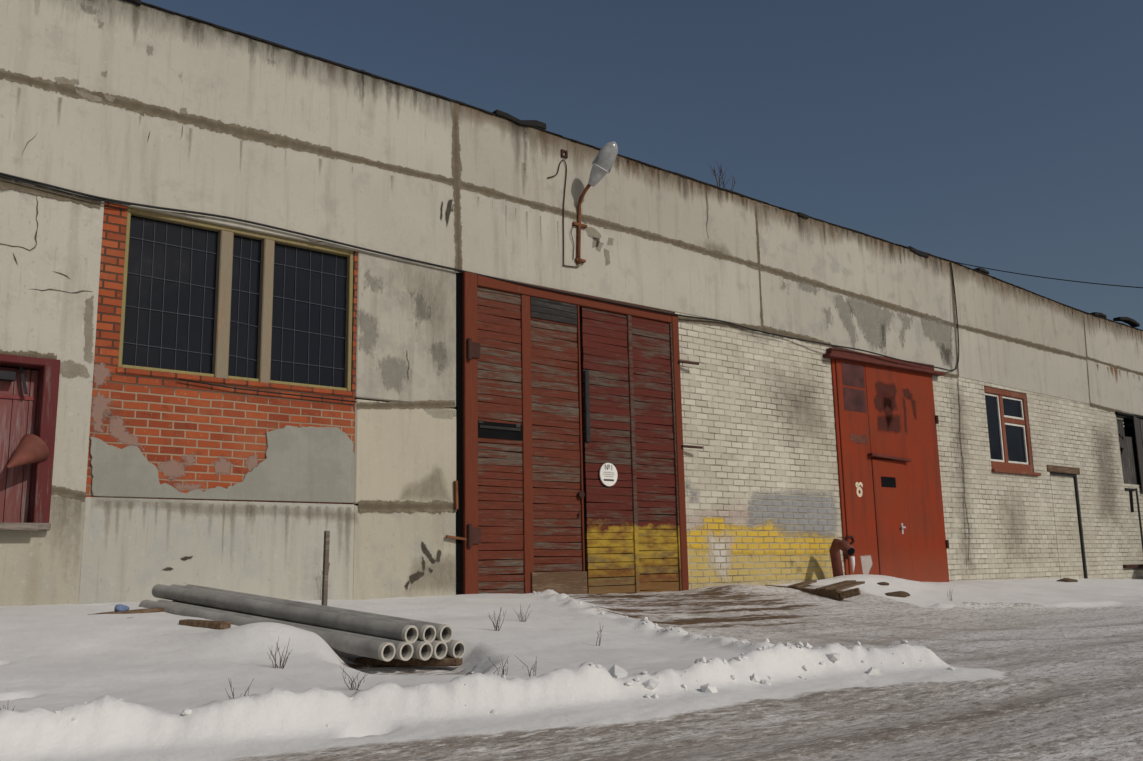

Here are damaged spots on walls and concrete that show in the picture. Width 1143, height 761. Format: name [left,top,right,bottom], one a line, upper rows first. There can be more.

crack [0,197,38,265]
crack [35,271,92,293]
flaking render [60,296,355,493]